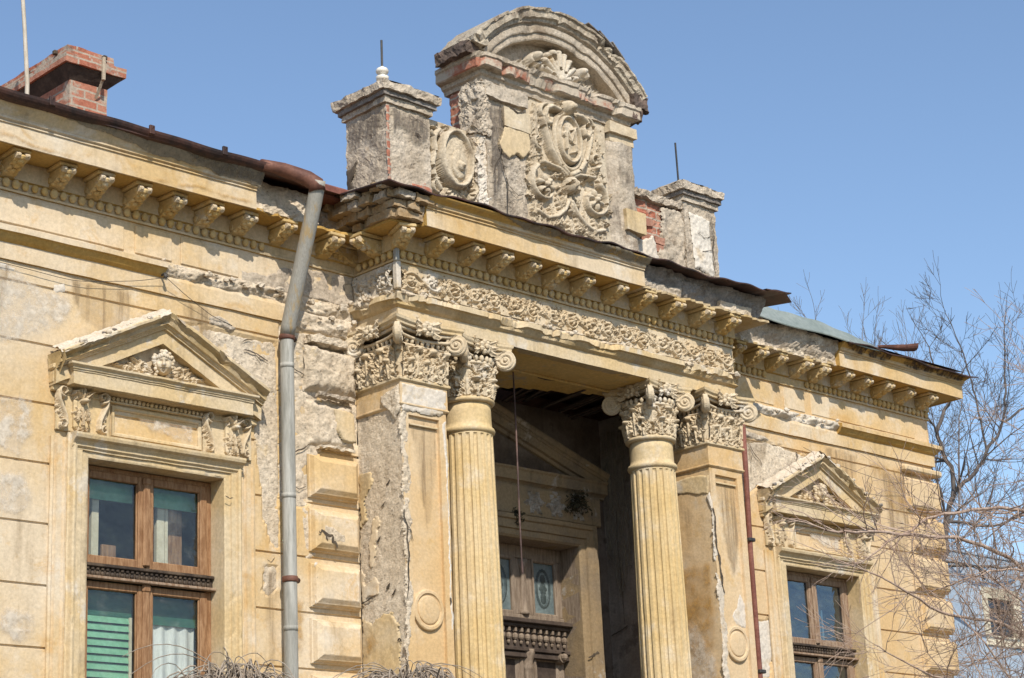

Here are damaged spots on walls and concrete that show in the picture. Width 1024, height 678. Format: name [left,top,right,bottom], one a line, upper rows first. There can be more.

flaking render [208,268,293,297]
flaking render [303,269,373,331]
flaking render [294,332,357,565]
flaking render [358,383,454,678]
flaking render [676,475,746,678]
flaking render [742,430,840,502]